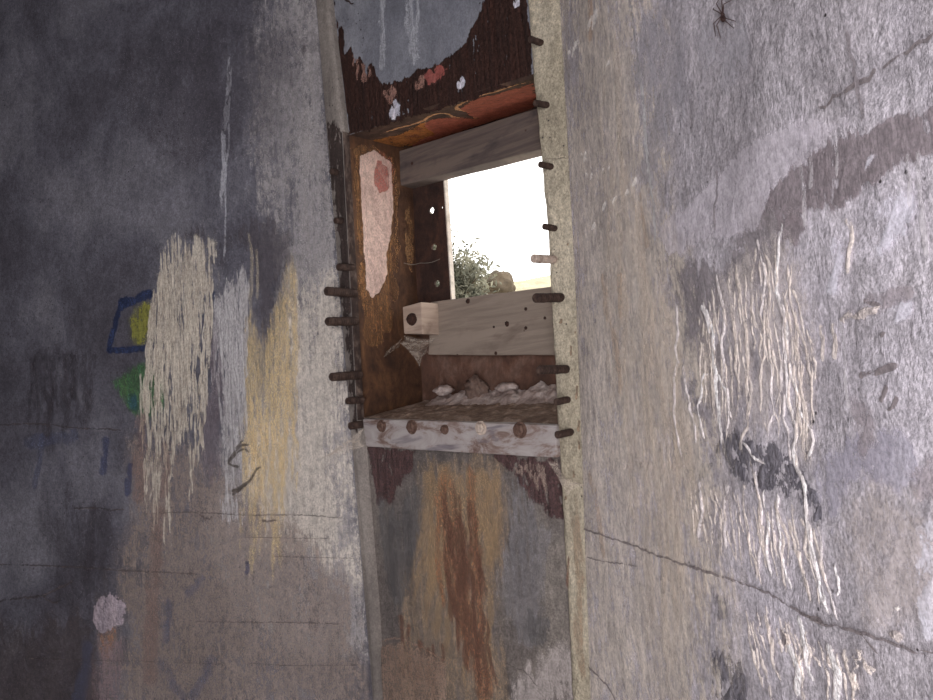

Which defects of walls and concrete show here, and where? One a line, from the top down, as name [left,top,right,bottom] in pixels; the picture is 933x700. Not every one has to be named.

leakage [88,0,364,700]
rust [327,120,401,434]
peeling [336,0,536,298]
leakage [561,0,933,700]
rust [435,466,496,700]
crack [584,528,933,654]